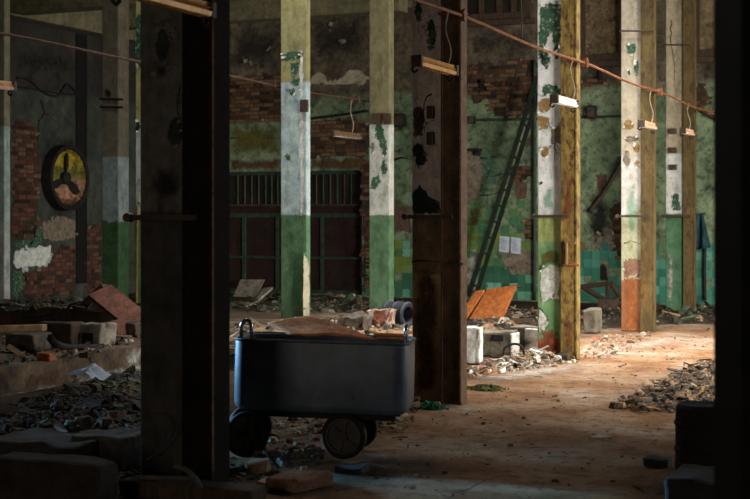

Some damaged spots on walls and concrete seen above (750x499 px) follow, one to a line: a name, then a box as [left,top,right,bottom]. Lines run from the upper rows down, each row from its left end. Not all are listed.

flaking render [230,40,369,124]
flaking render [467,1,561,158]
peeling [626,43,639,75]
flaking render [412,107,428,169]
spalling [623,120,640,168]
flaking render [10,119,102,301]
flaking render [284,112,388,294]
peeling [504,250,561,333]